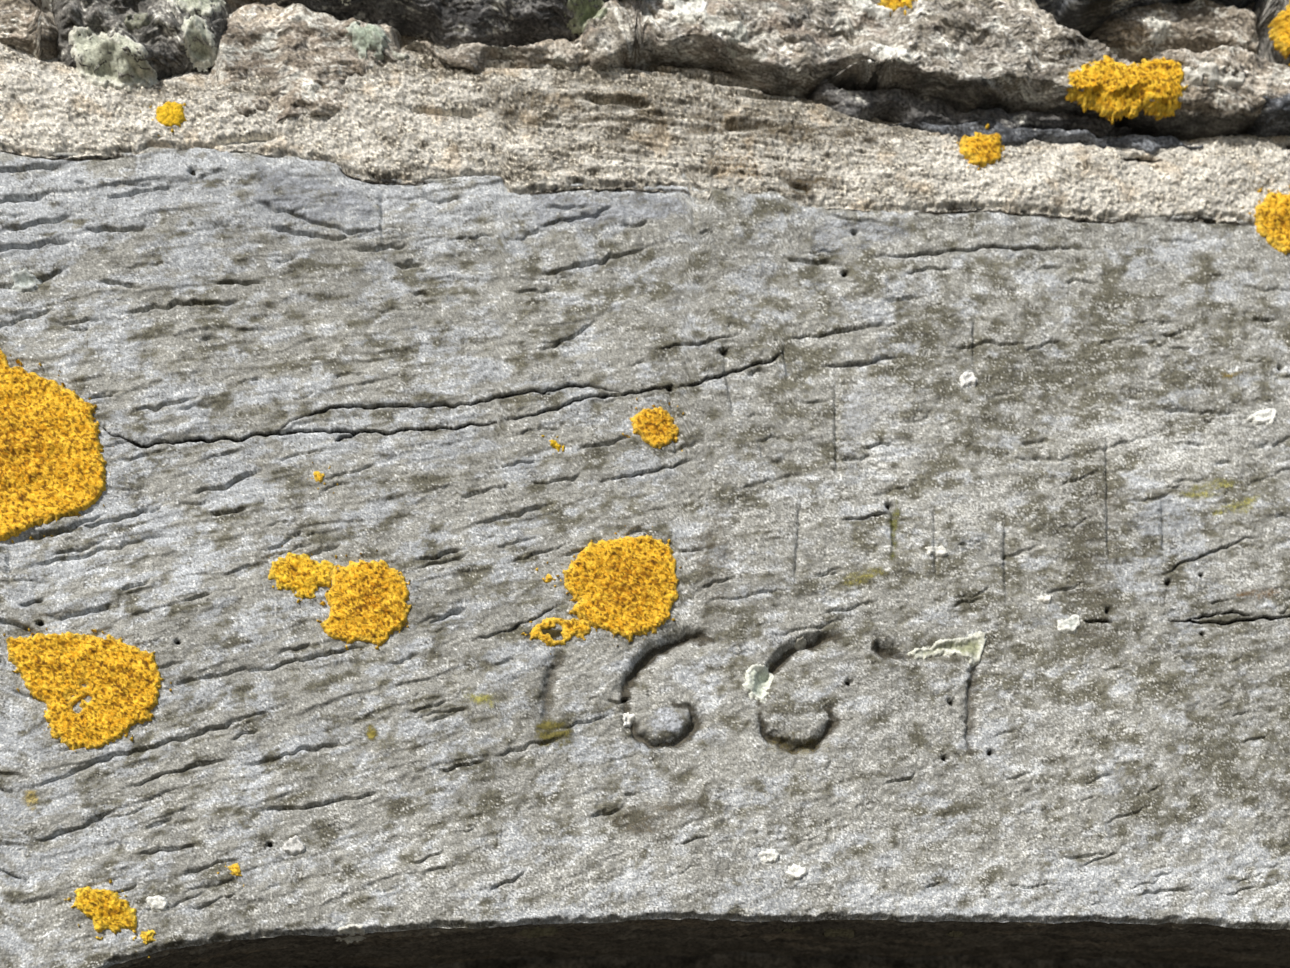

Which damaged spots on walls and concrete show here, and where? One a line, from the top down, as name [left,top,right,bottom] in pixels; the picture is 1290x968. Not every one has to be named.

crack [1168,611,1290,625]